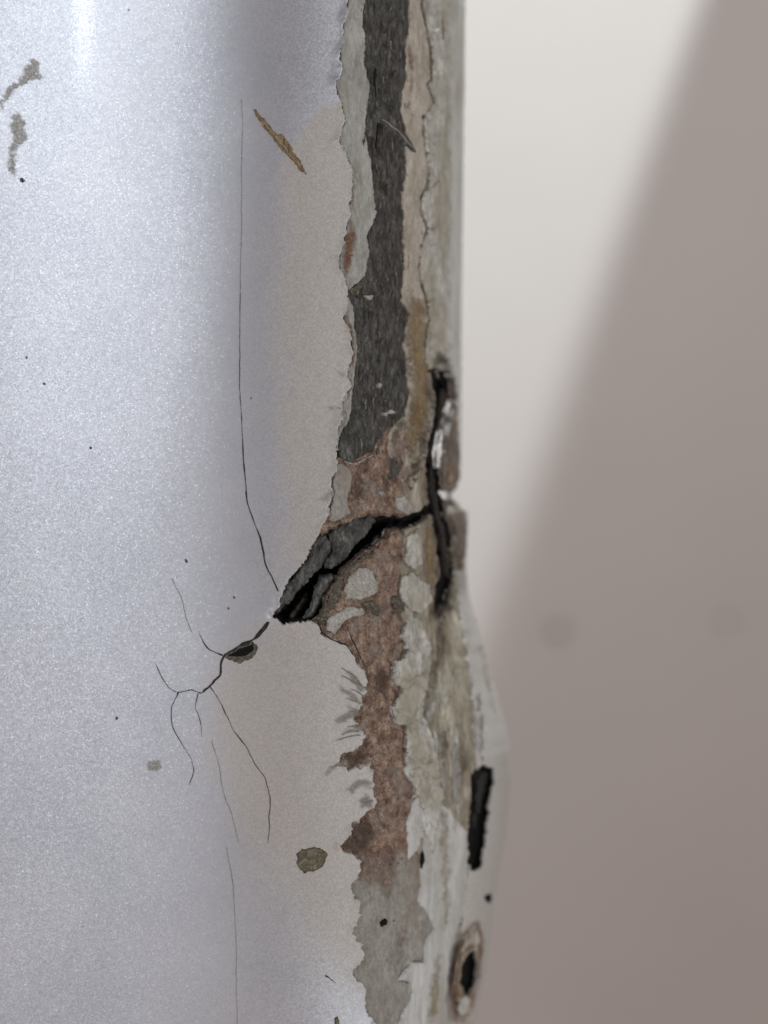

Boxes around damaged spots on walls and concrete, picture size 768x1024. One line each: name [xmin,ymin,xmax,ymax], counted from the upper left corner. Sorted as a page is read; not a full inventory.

crack [156,100,458,1022]
peeling [318,0,493,1024]